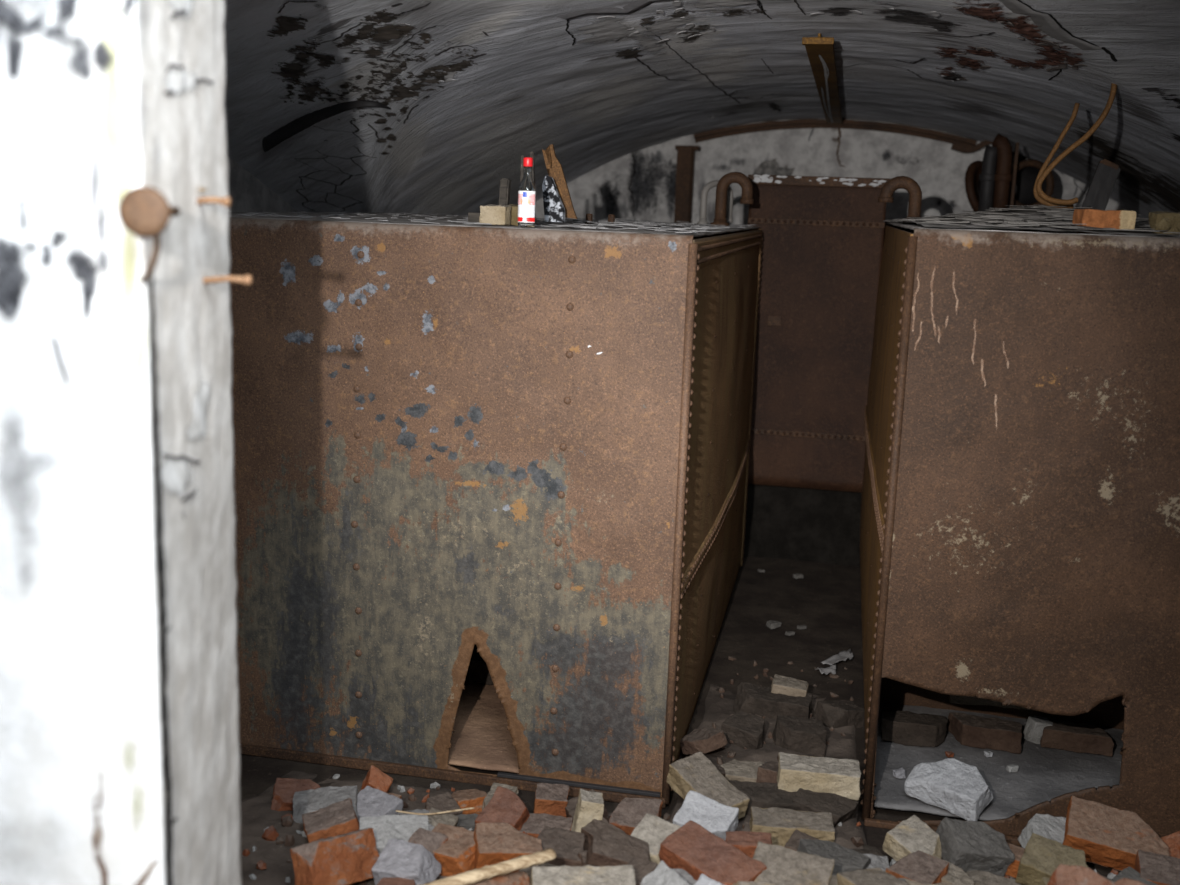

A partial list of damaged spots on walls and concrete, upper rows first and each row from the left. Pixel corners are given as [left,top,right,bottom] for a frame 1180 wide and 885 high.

spalling [164,63,214,95]
peeling [267,2,486,155]
crack [556,0,804,104]
rust [912,267,958,349]
rust [971,319,997,428]